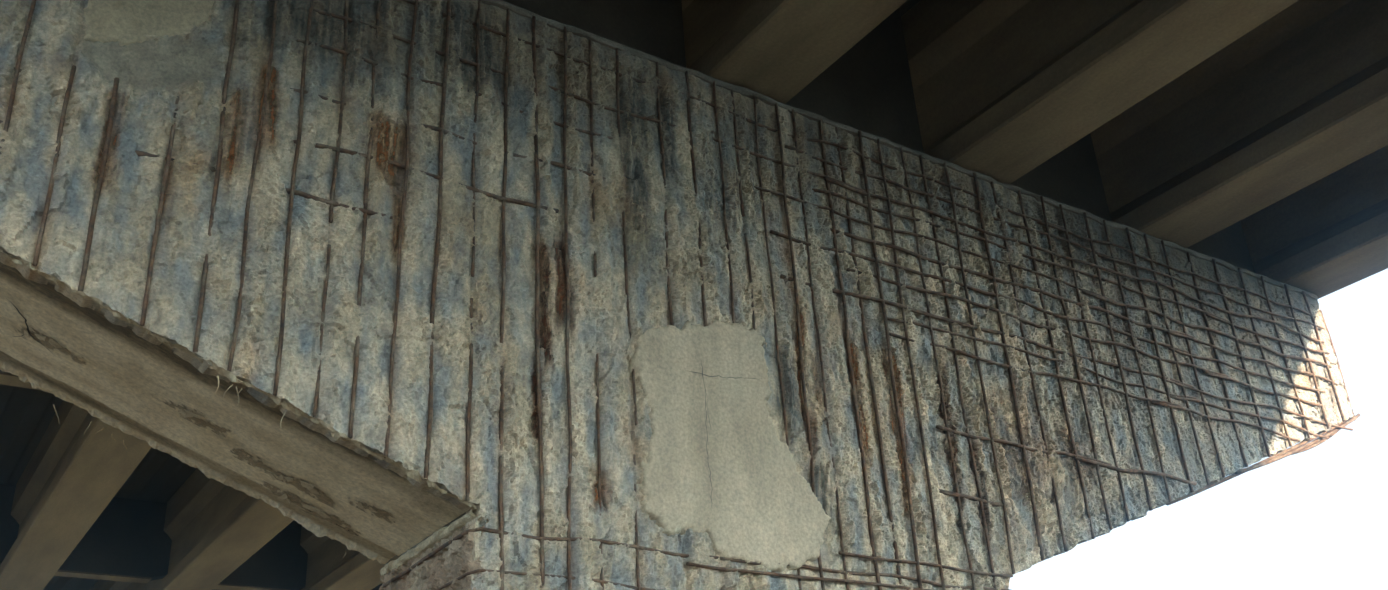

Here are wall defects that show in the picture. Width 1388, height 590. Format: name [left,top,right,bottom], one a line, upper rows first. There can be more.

corrosion [225,90,241,179]
corrosion [258,67,277,143]
corrosion [371,116,405,248]
crack [6,298,49,350]
peeling [19,328,85,364]
peeling [165,401,392,536]
spalling [379,522,503,590]